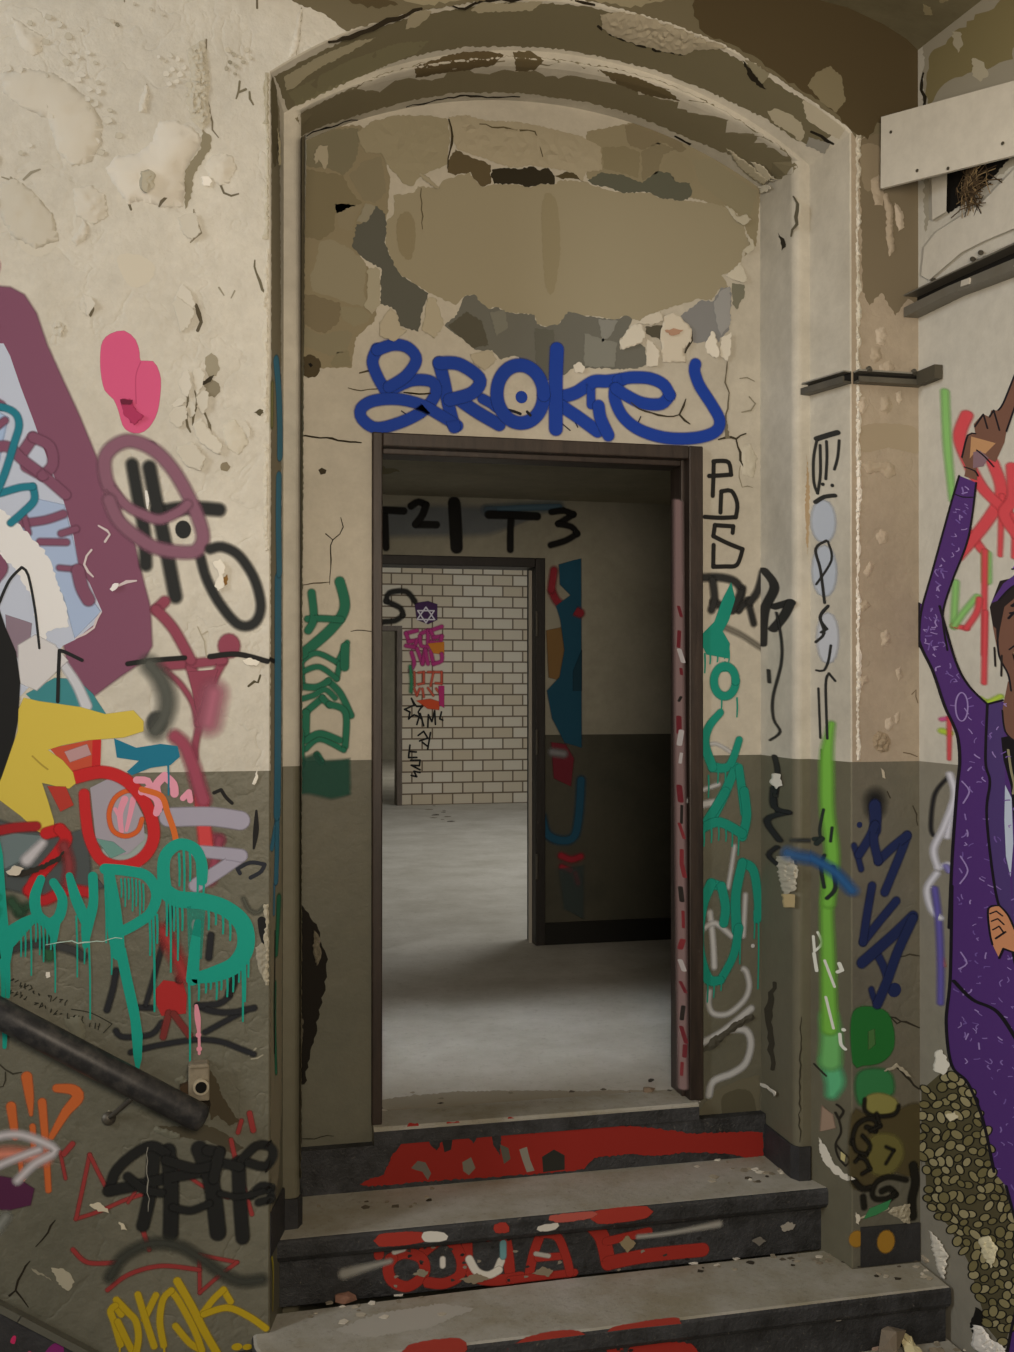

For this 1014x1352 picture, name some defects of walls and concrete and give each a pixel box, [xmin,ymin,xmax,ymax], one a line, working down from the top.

spalling [471,1,543,13]
spalling [600,12,727,55]
spalling [743,60,769,89]
spalling [184,39,246,209]
spalling [139,169,156,193]
peeling [727,149,777,194]
spalling [255,38,373,422]
spalling [304,115,755,380]
peeling [172,283,196,332]
peeling [168,367,223,454]
spalling [768,100,891,761]
spalling [262,443,270,551]